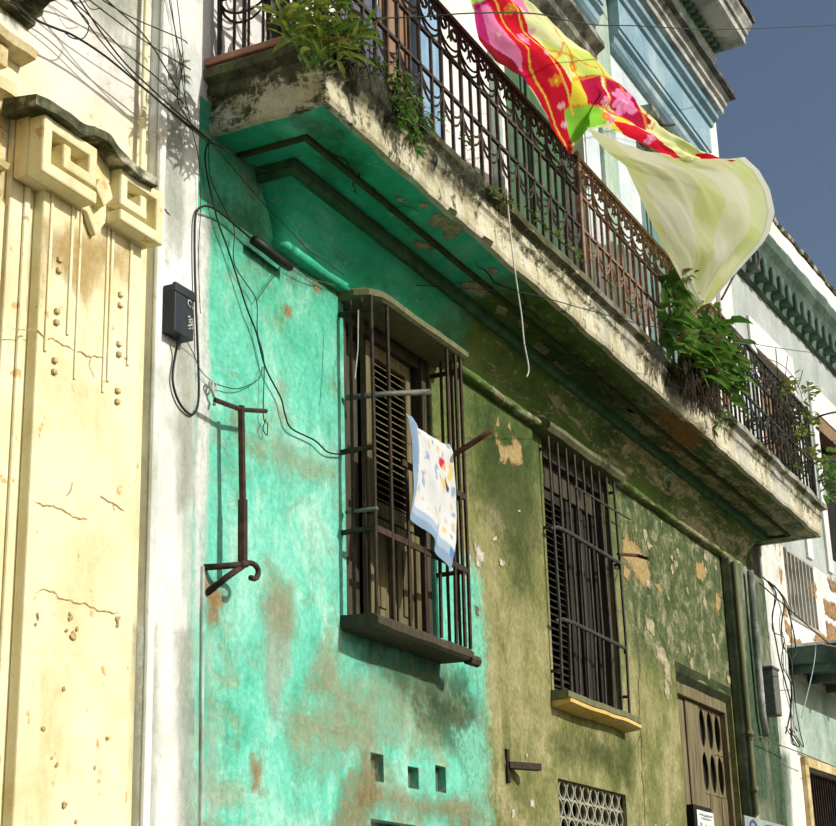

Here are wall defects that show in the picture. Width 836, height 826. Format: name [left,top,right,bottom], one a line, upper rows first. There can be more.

peeling [418,201,464,240]
spalling [493,417,523,467]
spalling [622,528,670,600]
crack [35,589,121,616]
peeling [645,615,672,700]
flaking render [339,760,486,826]